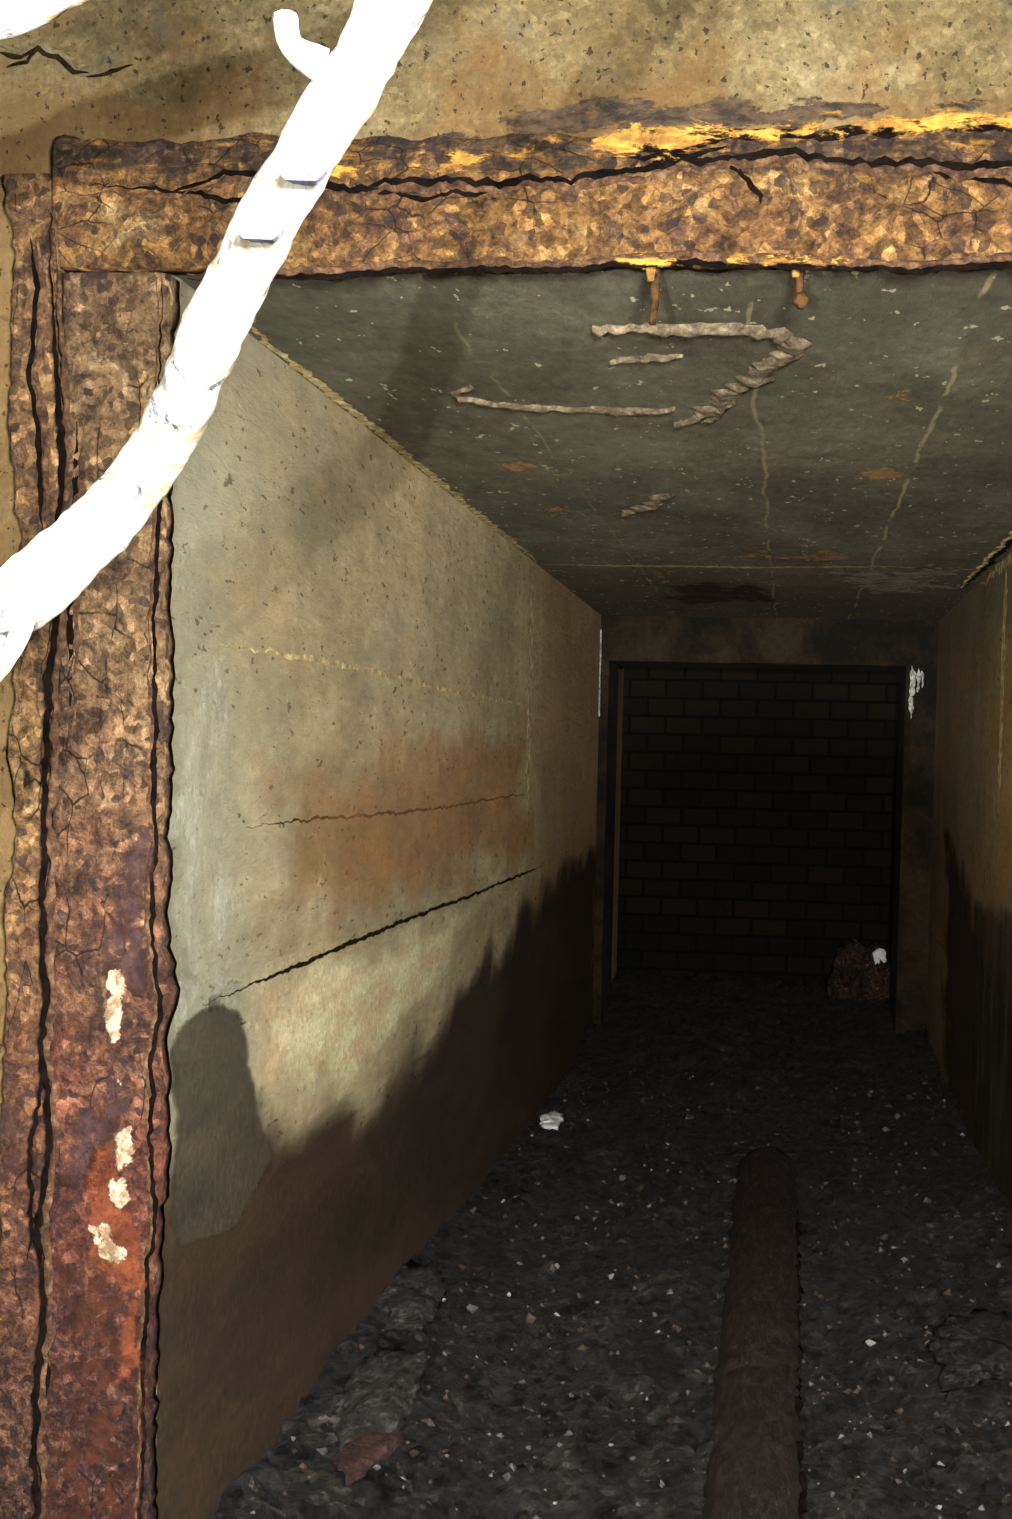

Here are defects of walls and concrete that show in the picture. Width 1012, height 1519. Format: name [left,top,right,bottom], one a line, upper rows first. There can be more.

rust [331,157,372,178]
rust [436,132,489,175]
crack [319,120,1012,206]
rust [498,96,1012,161]
crack [273,249,1012,281]
rust [614,251,676,326]
rust [727,253,850,310]
crack [218,322,1012,813]
crack [202,865,543,1006]
crack [133,500,164,1519]
crack [27,593,81,1519]
rust [66,833,154,1384]